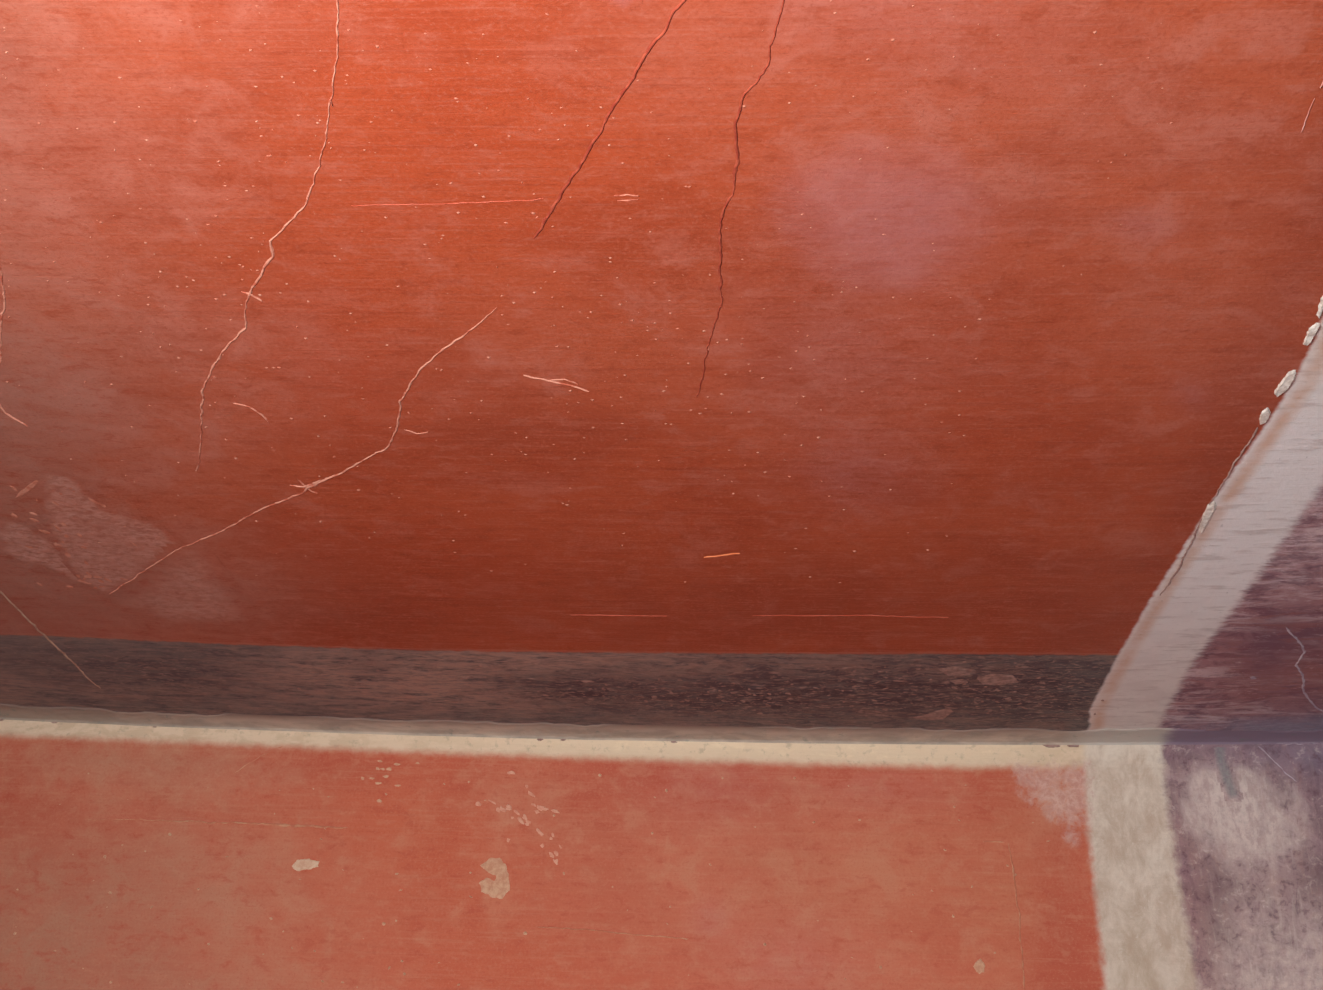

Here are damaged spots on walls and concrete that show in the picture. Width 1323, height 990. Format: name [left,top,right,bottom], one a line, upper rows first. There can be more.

crack [533,0,686,239]
crack [196,0,339,471]
crack [696,0,785,396]
crack [0,266,8,363]
crack [0,404,28,427]
crack [110,308,496,594]
crack [0,591,101,689]
peeling [475,771,562,865]
peeling [479,858,510,899]